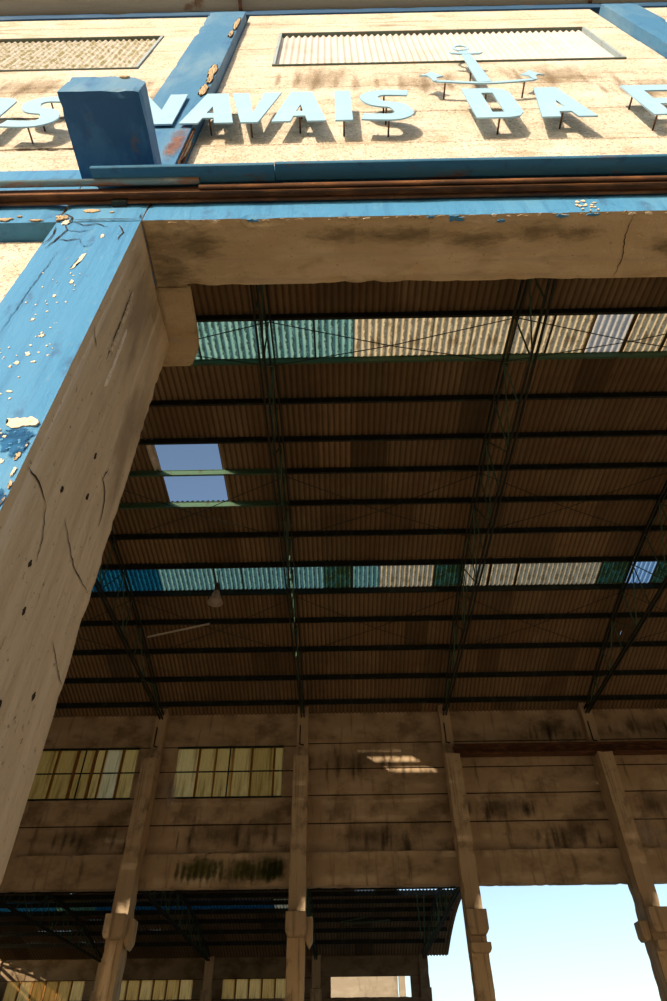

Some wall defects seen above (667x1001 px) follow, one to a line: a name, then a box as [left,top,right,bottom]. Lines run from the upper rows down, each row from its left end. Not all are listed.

spalling [198,64,218,97]
spalling [55,213,73,225]
crack [2,213,142,328]
peeling [0,327,53,378]
spalling [104,292,134,386]
peeling [0,416,39,504]